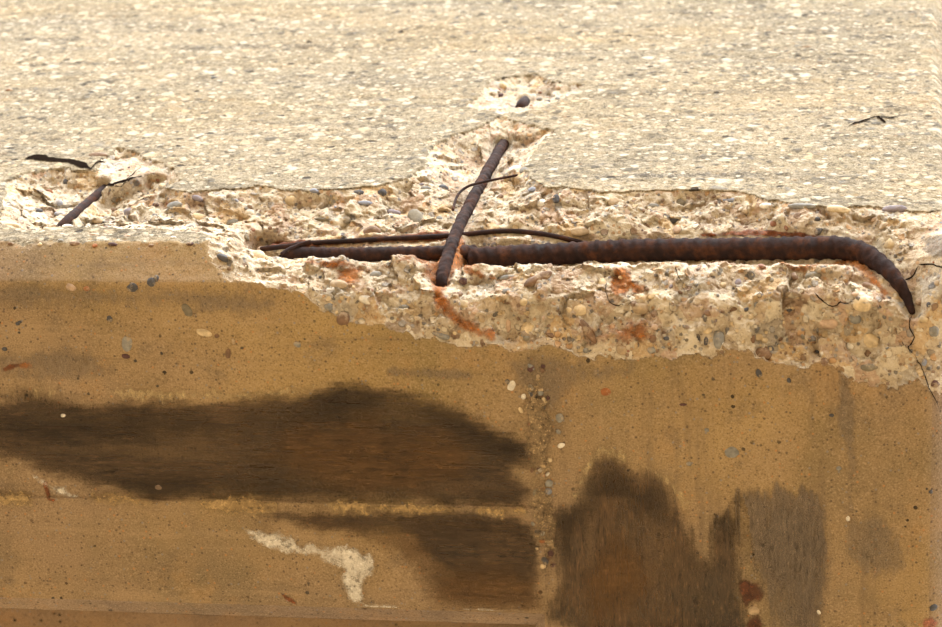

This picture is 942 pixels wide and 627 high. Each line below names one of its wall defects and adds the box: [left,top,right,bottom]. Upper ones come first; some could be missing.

crack [26,154,142,187]
corrosion [308,260,360,282]
corrosion [373,231,495,340]
spalling [0,74,942,395]
corrosion [611,267,642,294]
corrosion [700,229,817,237]
crack [905,263,942,280]
crack [902,316,939,407]
damp [0,386,538,611]
damp [549,454,825,627]